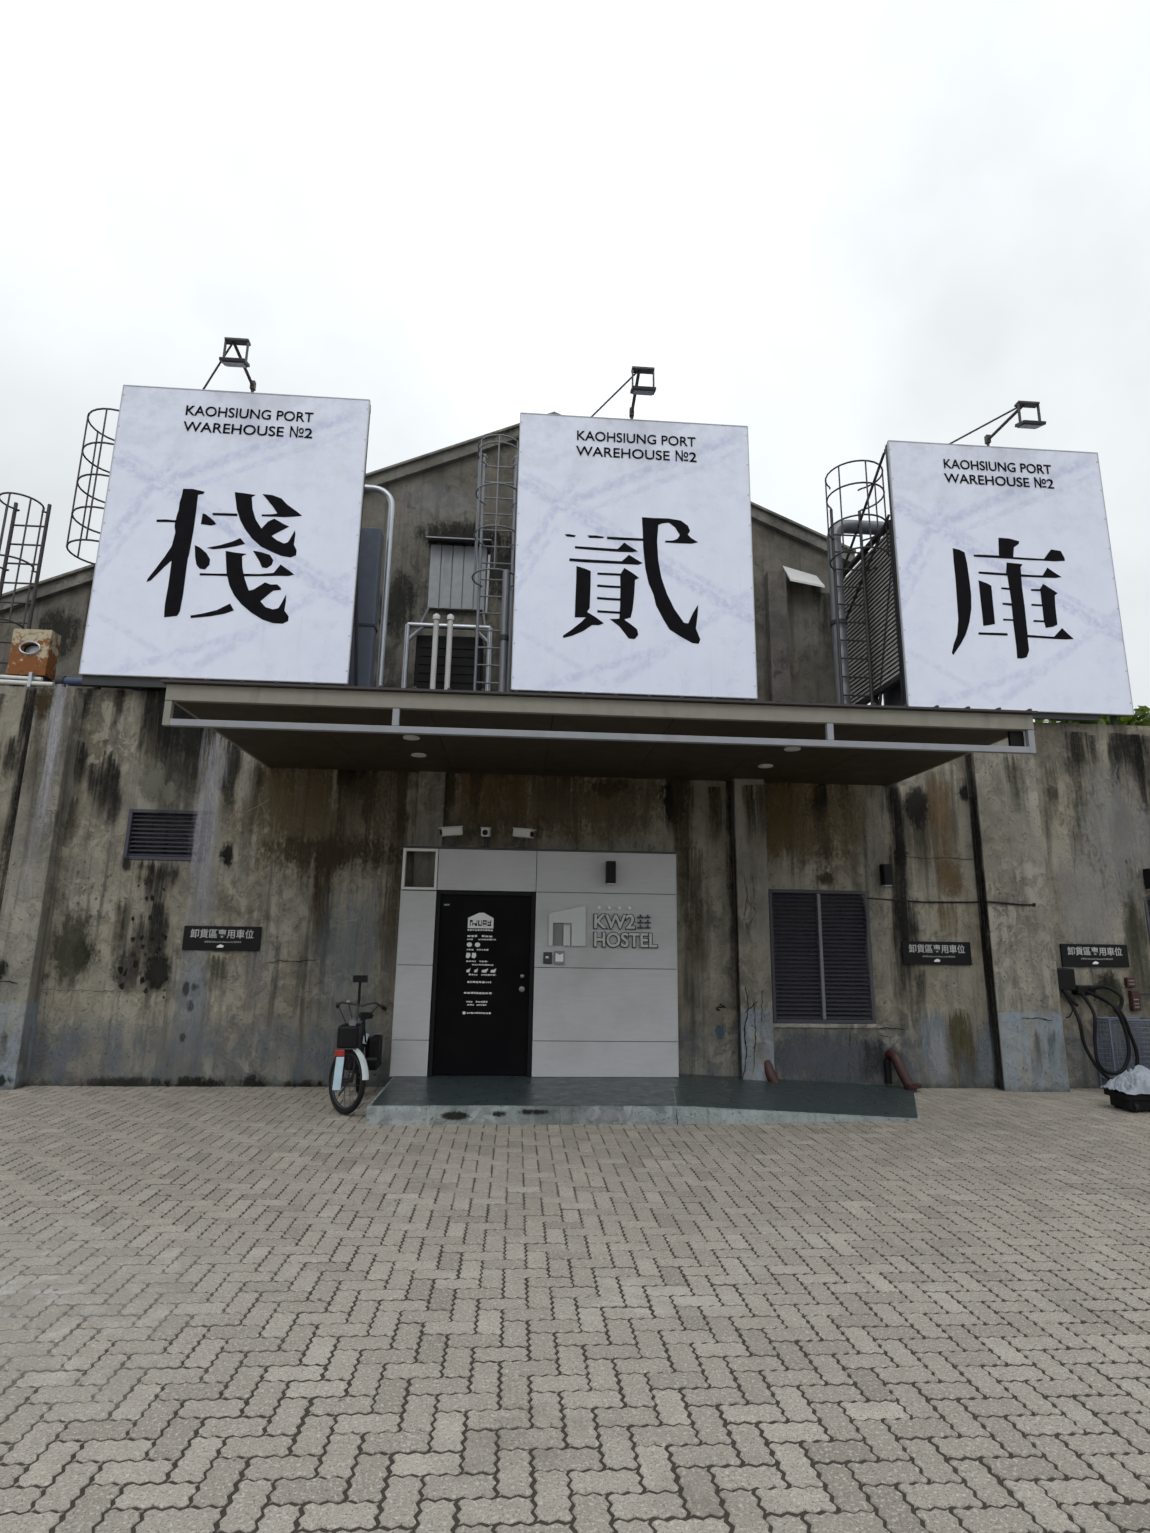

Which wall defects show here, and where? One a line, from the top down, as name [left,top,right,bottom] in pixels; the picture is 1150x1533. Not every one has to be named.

leakage [0,684,92,893]
leakage [41,910,94,985]
leakage [74,743,121,820]
leakage [122,857,224,1042]
leakage [115,688,266,882]
leakage [268,770,408,939]
leakage [885,783,935,993]
leakage [920,753,1004,1089]
leakage [1045,732,1150,1017]